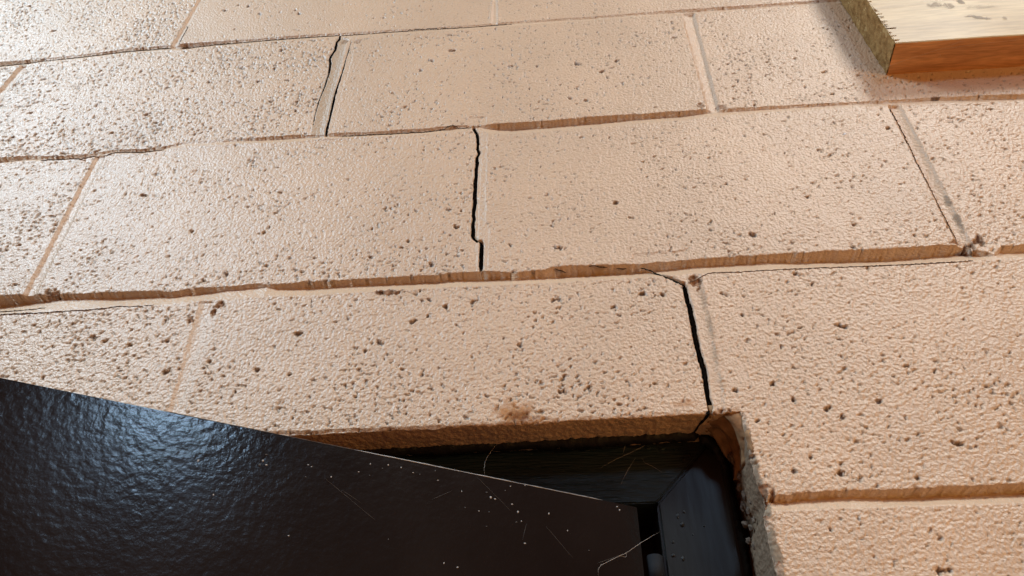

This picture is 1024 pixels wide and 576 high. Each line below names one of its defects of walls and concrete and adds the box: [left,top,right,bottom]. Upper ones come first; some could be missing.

crack [0,24,511,271]
crack [556,109,973,433]